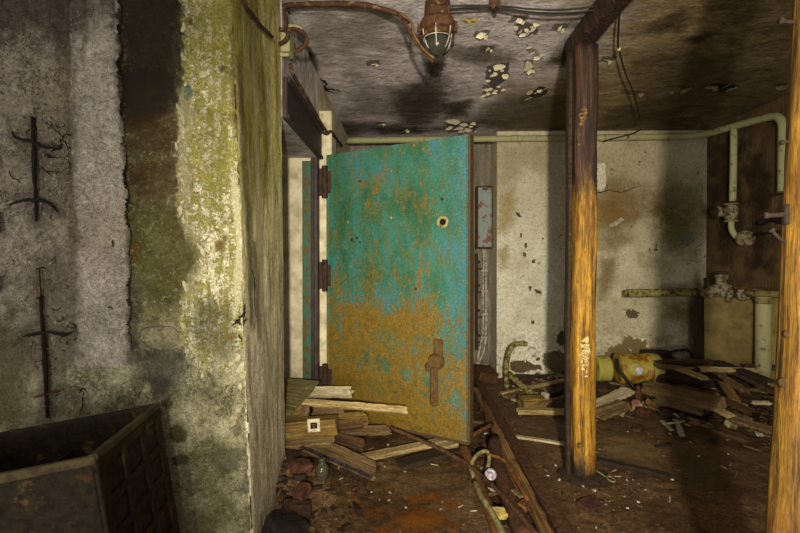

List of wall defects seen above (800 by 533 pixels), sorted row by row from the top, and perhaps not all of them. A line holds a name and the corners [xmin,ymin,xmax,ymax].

water stain [450,49,511,63]
peeling [508,15,548,100]
water stain [342,63,471,133]
peeling [445,119,478,133]
peeling [480,63,510,100]
water stain [478,97,566,129]
spalling [9,116,71,222]
spalling [23,260,76,418]
peeling [604,335,649,360]